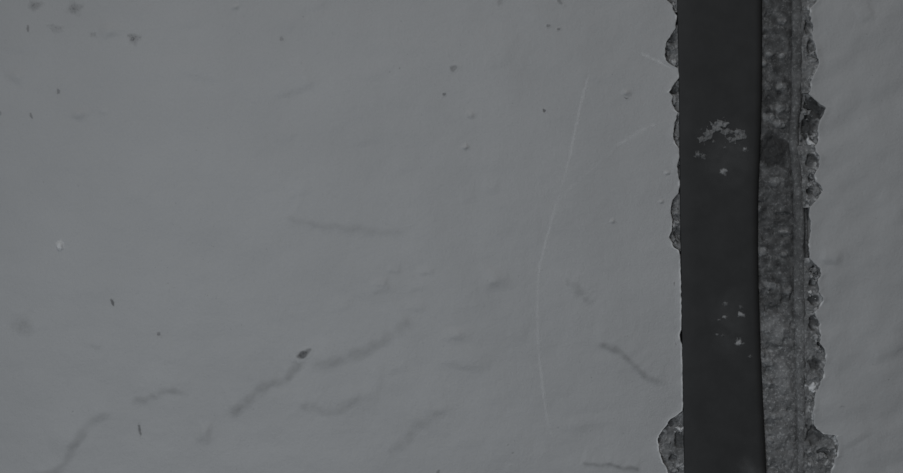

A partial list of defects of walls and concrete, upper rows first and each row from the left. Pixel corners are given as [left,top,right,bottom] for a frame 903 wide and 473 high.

flaking render [665,25,678,68]
flaking render [670,80,679,147]
flaking render [797,0,826,208]
flaking render [669,162,681,251]
flaking render [803,258,838,473]
flaking render [658,411,684,473]